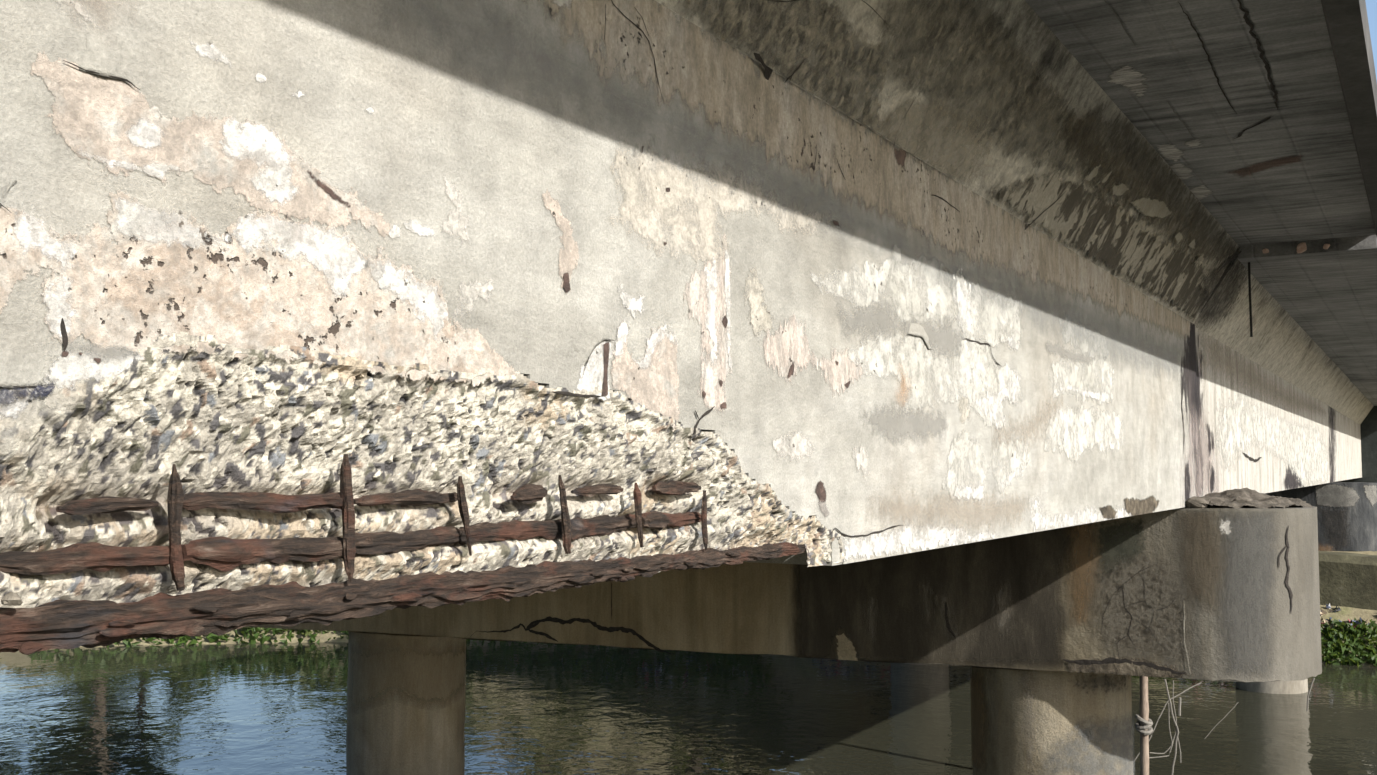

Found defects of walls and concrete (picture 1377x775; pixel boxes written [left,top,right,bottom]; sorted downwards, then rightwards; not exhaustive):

crack [1178,0,1278,139]
peeling [544,0,1208,502]
spalling [0,0,996,655]
leakage [687,0,1275,673]
crack [471,583,676,655]
spalling [836,633,858,661]
leakage [794,526,1075,756]
peeling [1029,495,1160,532]
crack [1278,525,1293,611]